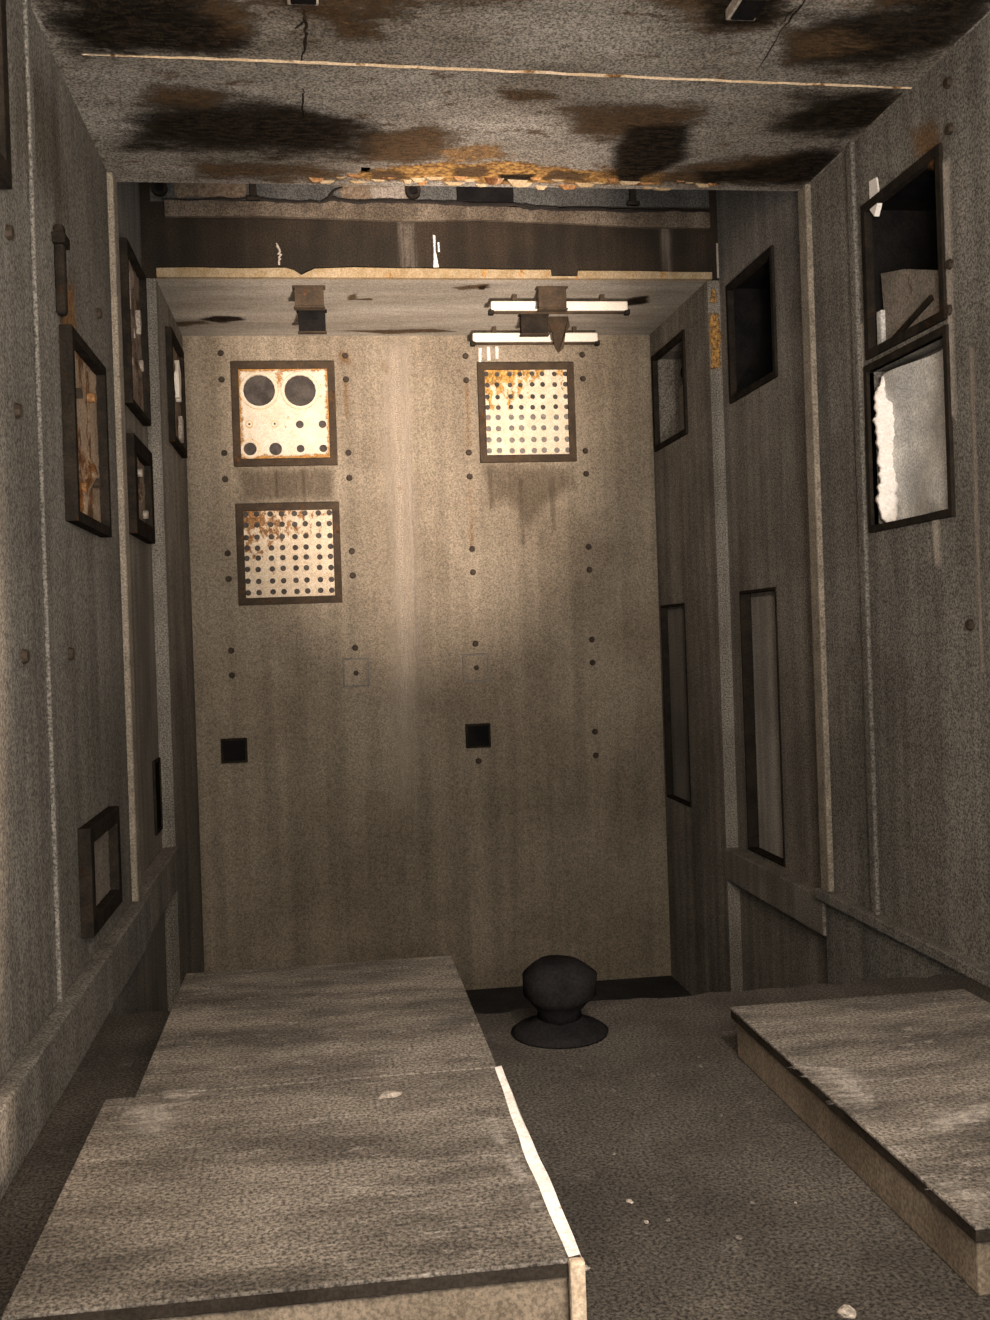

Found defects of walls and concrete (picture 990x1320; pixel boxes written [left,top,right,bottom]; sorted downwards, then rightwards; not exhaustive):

leakage [42,0,415,66]
crack [295,13,309,110]
leakage [648,0,990,69]
leakage [121,85,452,164]
corrosion [194,145,699,186]
leakage [498,90,902,186]
leakage [626,296,648,305]